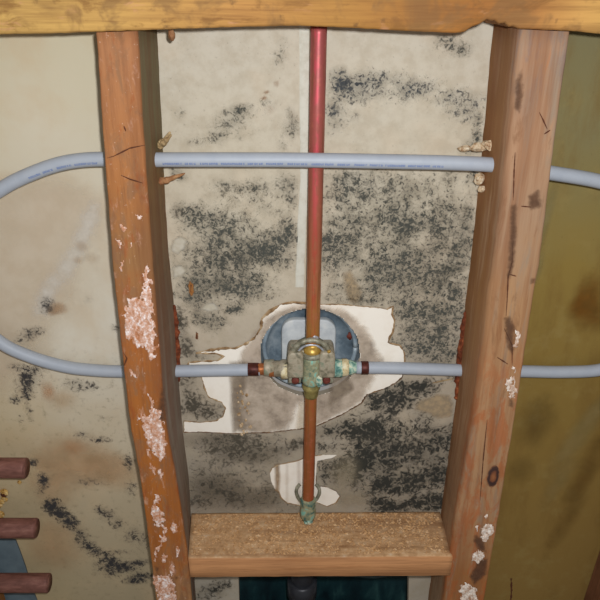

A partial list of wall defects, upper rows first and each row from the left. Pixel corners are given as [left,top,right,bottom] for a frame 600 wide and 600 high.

leakage [328,68,387,128]
leakage [175,201,298,358]
peeling [187,301,306,365]
peeling [320,273,406,362]
leakage [321,169,474,363]
peeling [183,376,305,434]
leakage [201,375,305,463]
peeling [270,458,303,506]
peeling [314,455,340,507]
peeling [316,374,403,426]
leakage [316,373,453,512]
leakage [41,498,153,584]